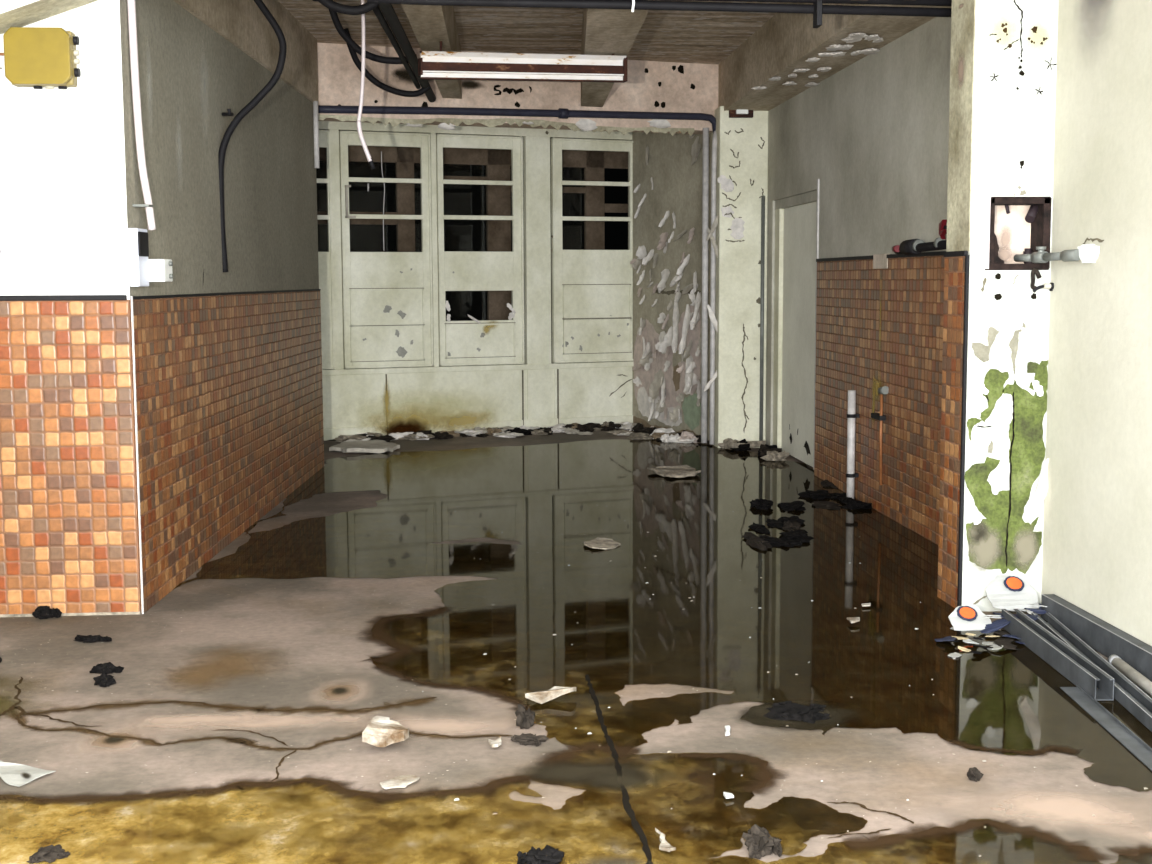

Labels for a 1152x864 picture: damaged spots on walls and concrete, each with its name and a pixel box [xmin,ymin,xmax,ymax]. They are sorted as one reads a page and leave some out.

water stain [751,32,884,90]
crack [989,0,1056,95]
peeling [598,210,718,436]
rust [385,390,479,434]
crack [977,384,1015,567]
peeling [964,322,1048,574]
crack [0,677,512,781]